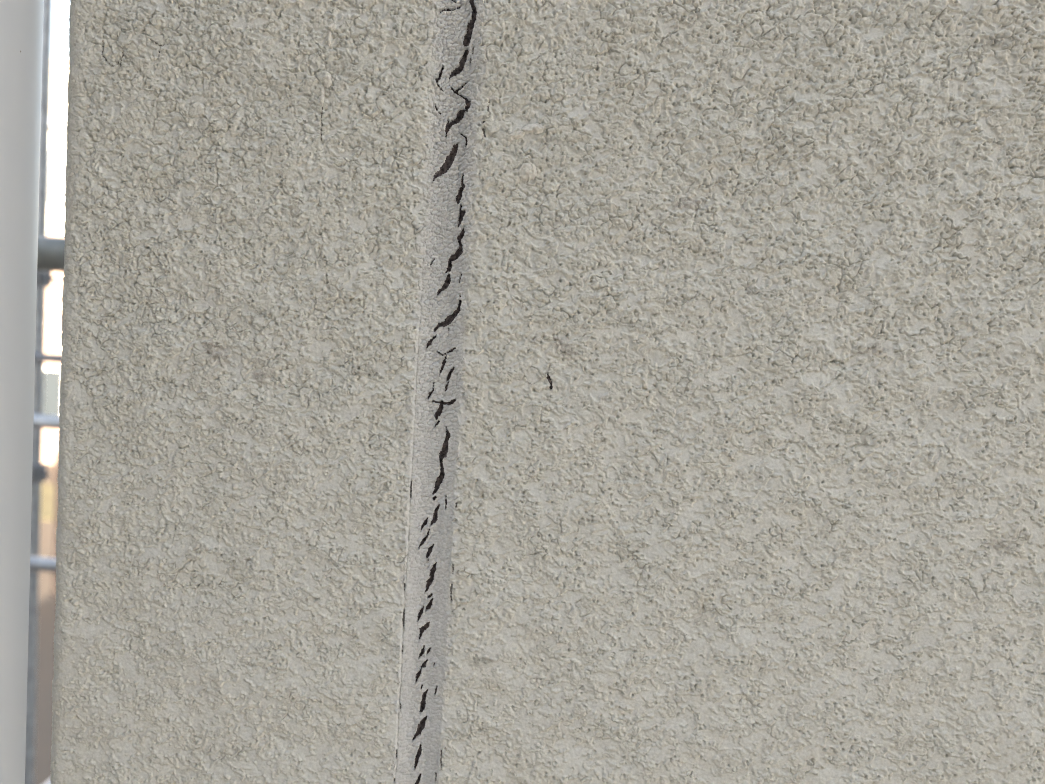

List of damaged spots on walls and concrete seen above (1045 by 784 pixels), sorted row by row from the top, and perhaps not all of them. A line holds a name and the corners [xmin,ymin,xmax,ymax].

crack [394,0,490,784]